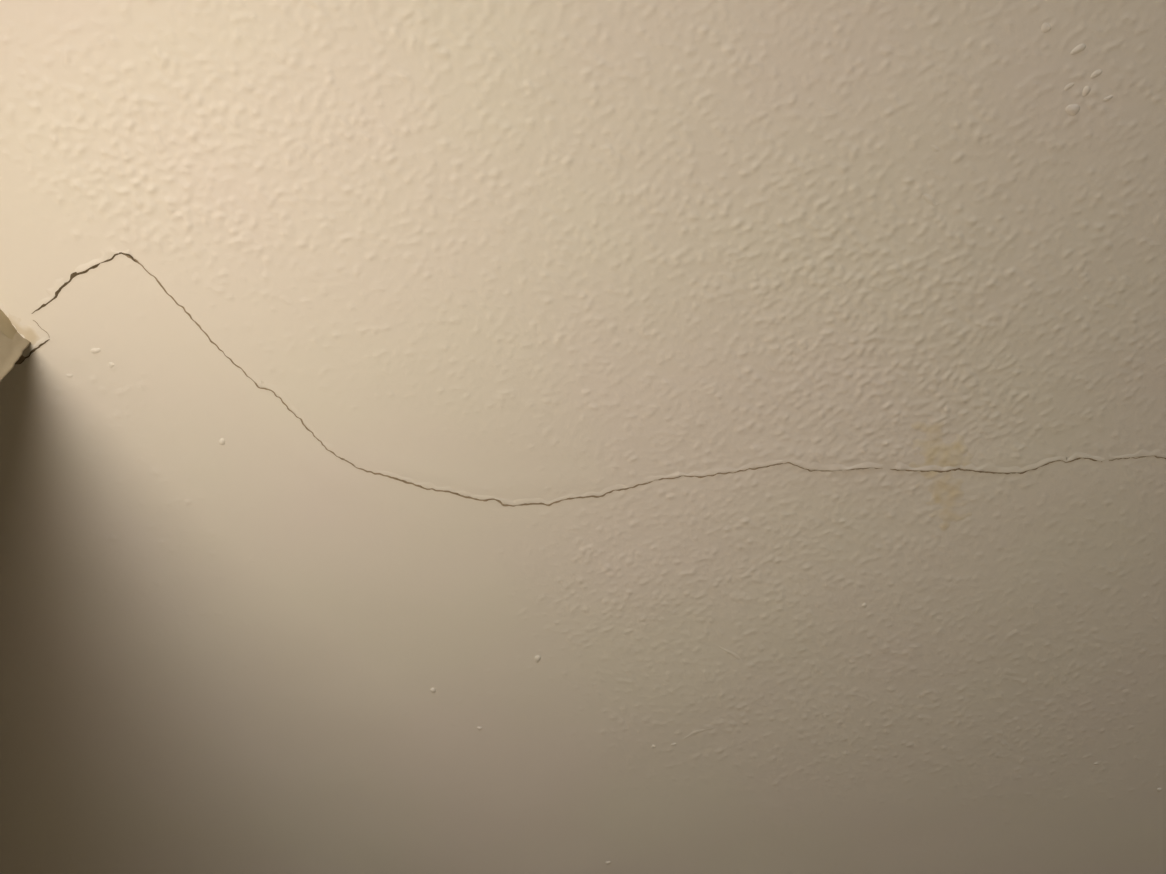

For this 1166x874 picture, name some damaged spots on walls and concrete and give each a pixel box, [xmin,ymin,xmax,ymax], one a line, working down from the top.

crack [19,249,1166,507]